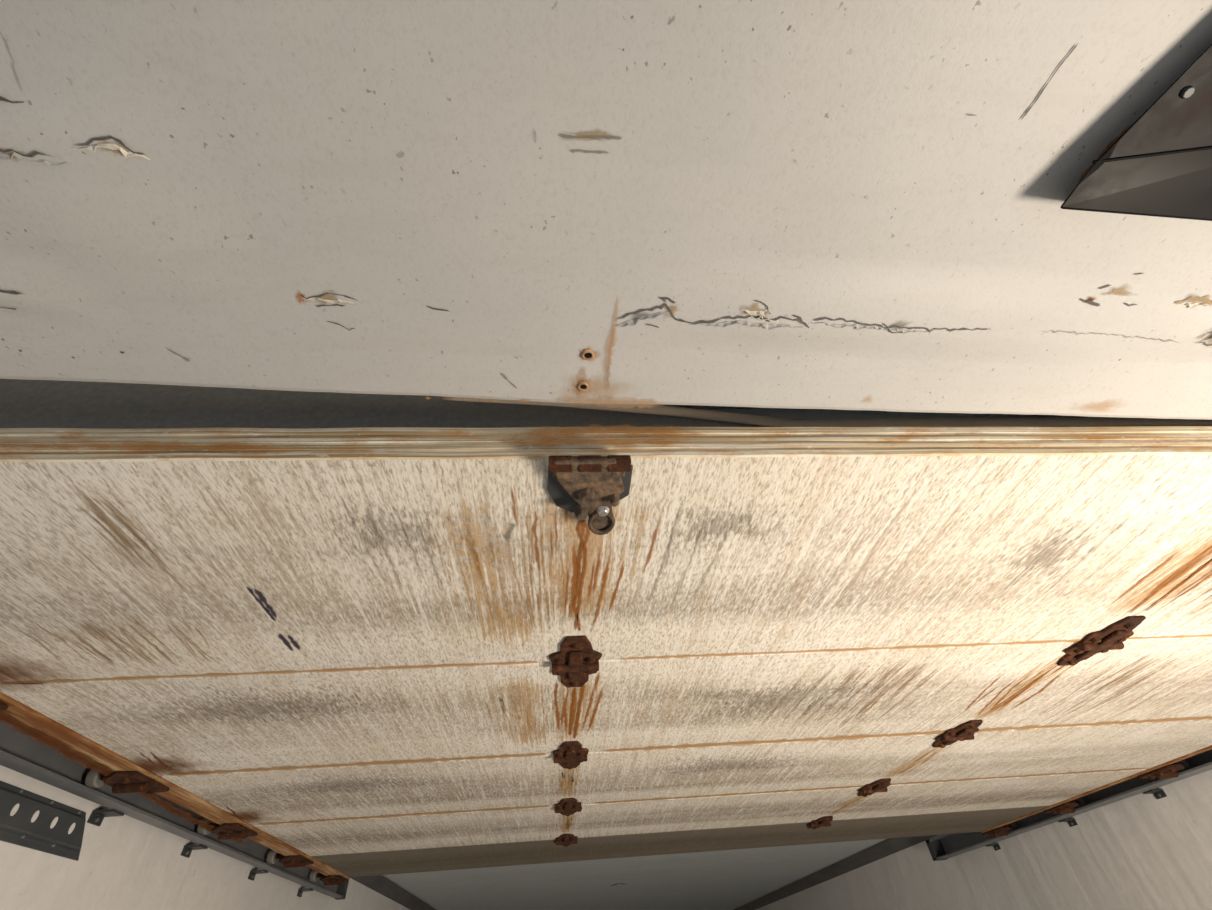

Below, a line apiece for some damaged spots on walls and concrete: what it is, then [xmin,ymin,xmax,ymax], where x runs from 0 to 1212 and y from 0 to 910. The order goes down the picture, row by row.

crack [0,32,24,103]
peeling [72,136,150,160]
peeling [297,293,357,307]
peeling [615,297,809,330]
crack [811,317,988,334]
spalling [1081,285,1137,307]
spalling [1176,295,1212,309]
corrosion [531,510,624,631]
corrosion [1116,546,1212,613]
corrosion [625,640,1081,660]
corrosion [0,661,538,685]
corrosion [606,730,946,752]